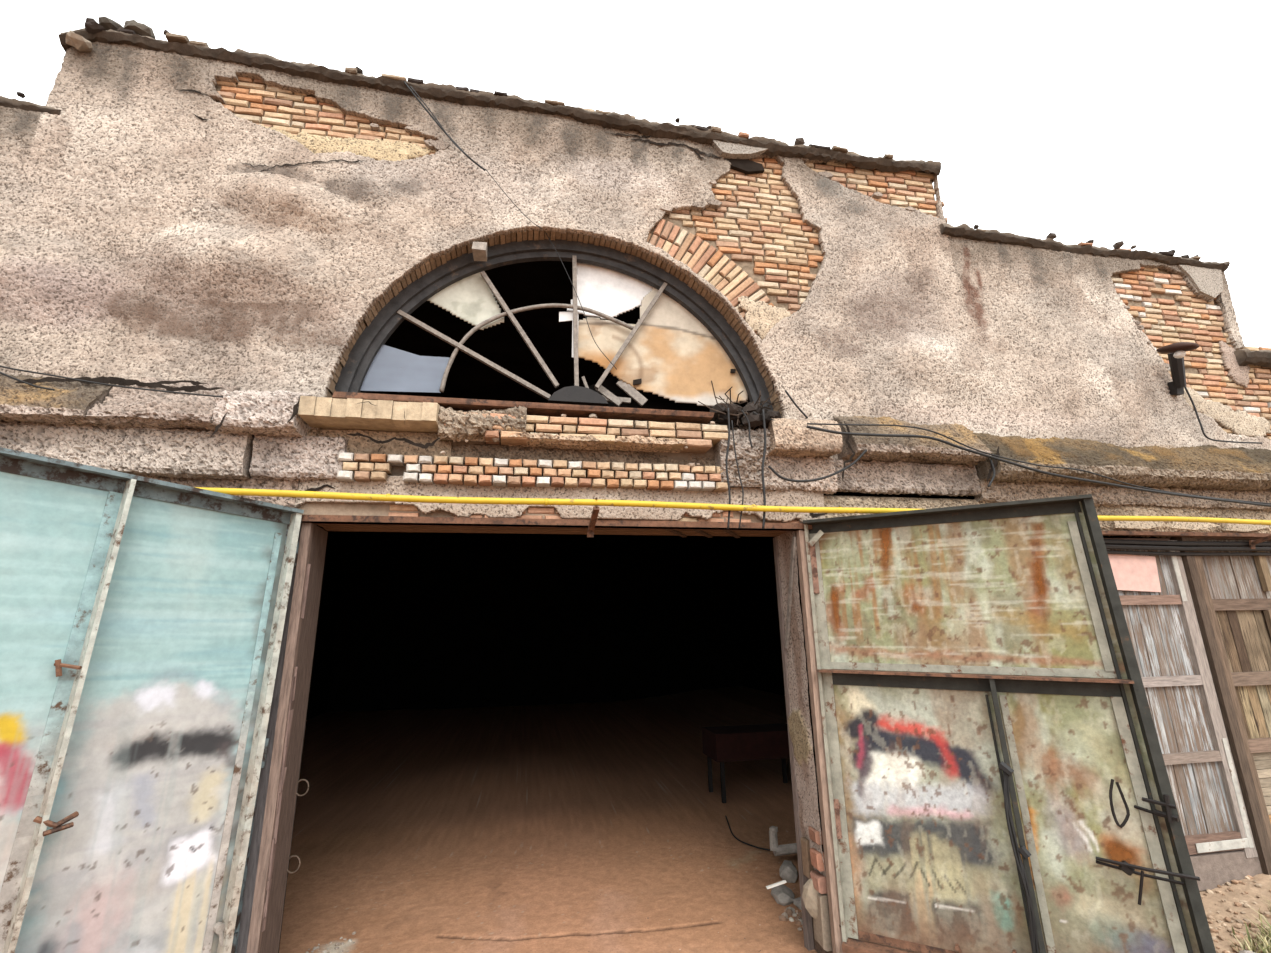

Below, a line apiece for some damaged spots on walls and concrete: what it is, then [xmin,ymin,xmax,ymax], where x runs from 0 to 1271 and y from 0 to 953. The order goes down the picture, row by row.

spalling [217,77,449,161]
spalling [805,162,948,223]
spalling [647,140,824,340]
corrosion [963,252,983,320]
spalling [1111,265,1271,439]
corrosion [831,588,839,630]
corrosion [880,528,892,570]
corrosion [1034,561,1045,596]